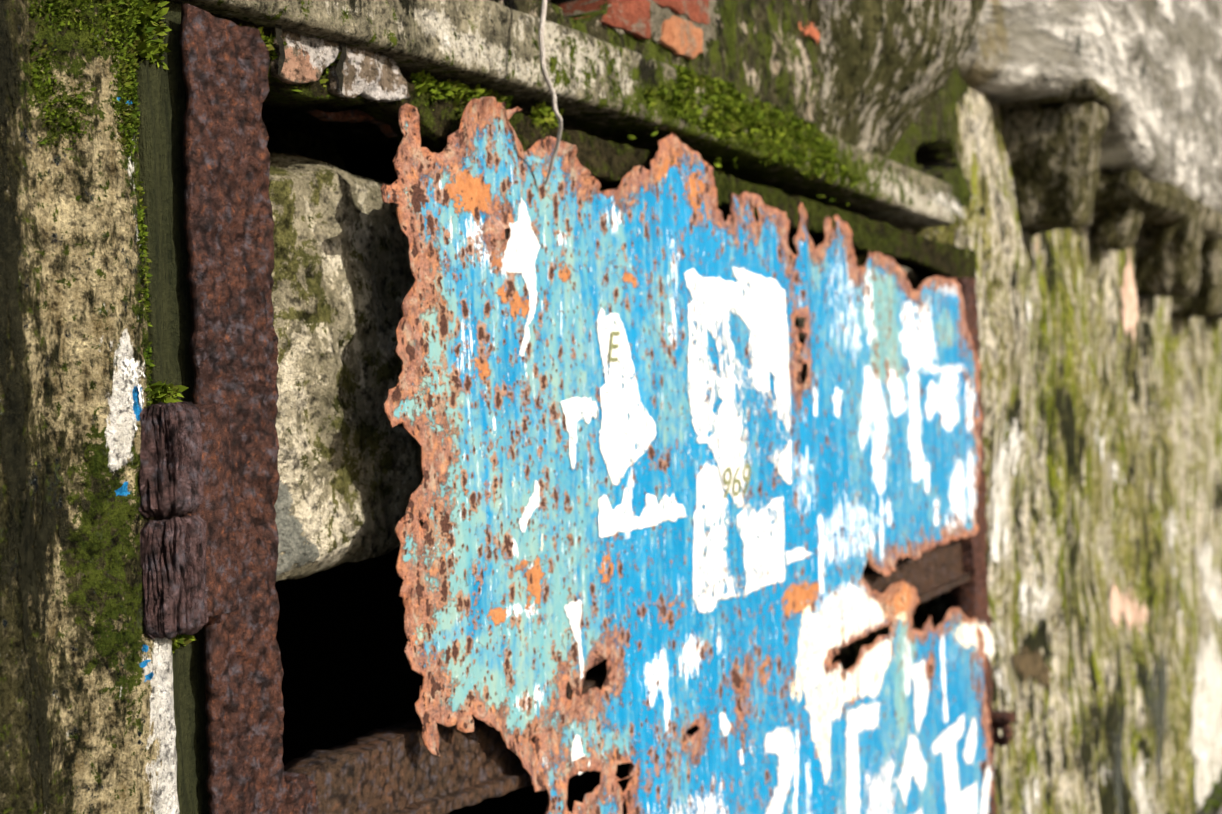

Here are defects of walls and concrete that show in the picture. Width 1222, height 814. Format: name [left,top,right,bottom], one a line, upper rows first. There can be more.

water stain [635,49,659,91]
water stain [0,0,91,814]
peeling [798,582,893,786]
water stain [1107,713,1123,814]
water stain [1138,645,1170,799]